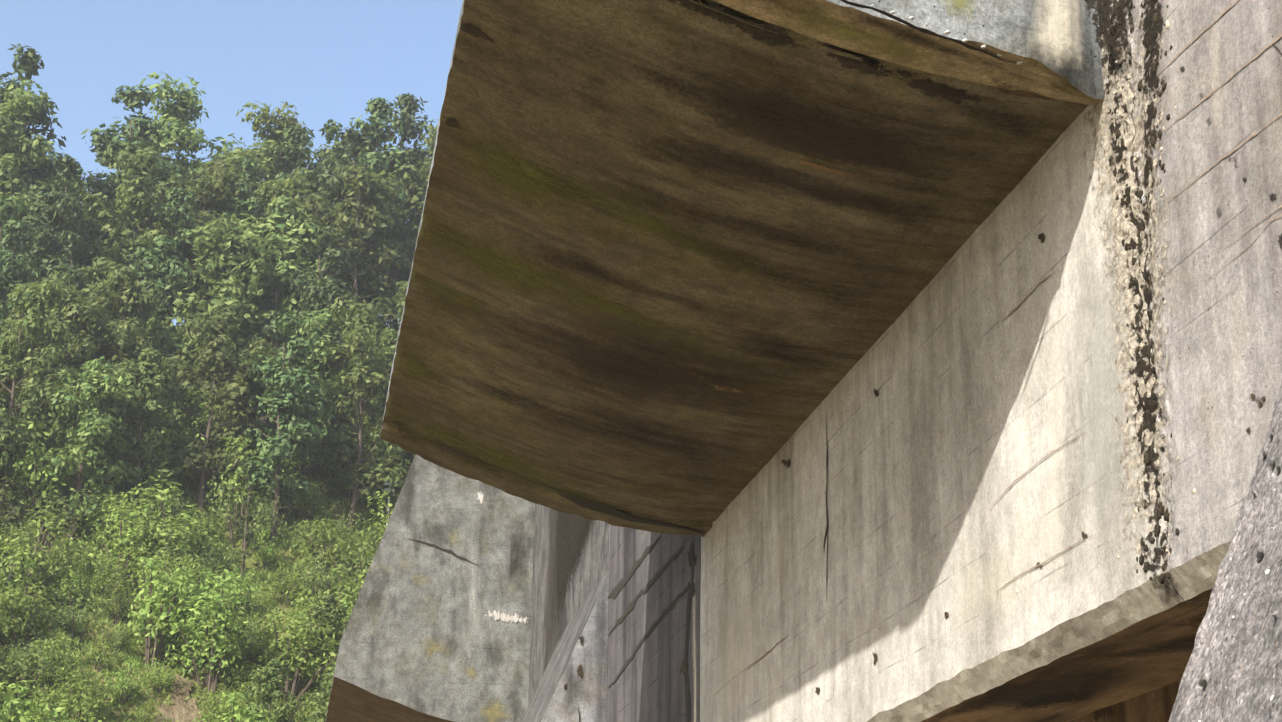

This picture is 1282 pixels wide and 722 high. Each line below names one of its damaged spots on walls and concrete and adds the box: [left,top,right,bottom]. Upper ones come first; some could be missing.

damp [650,73,951,228]
crack [411,539,478,565]
crack [822,420,830,598]